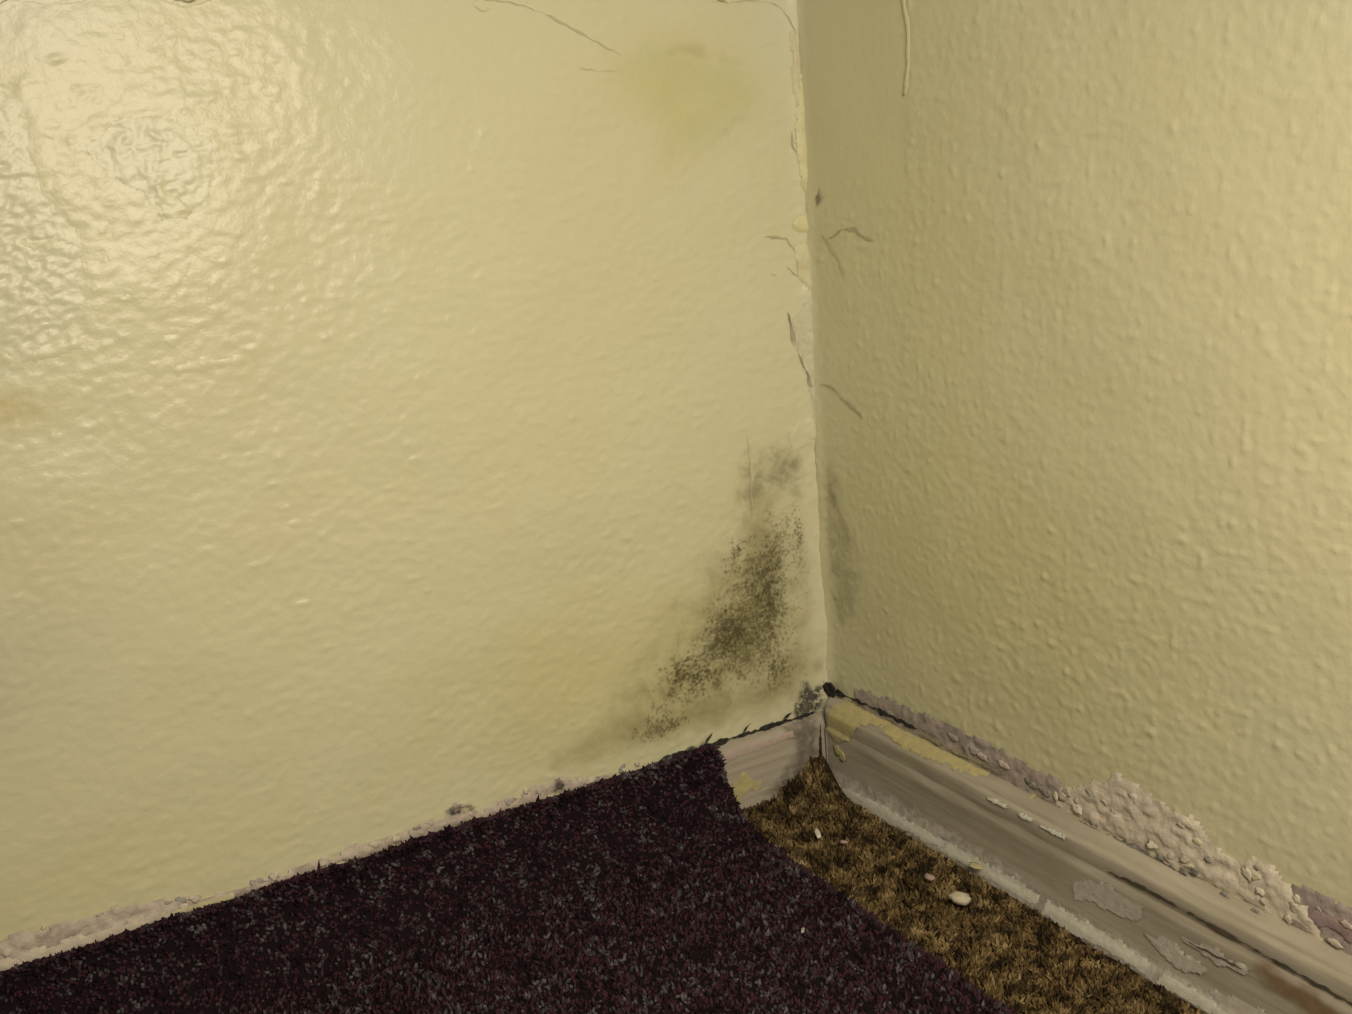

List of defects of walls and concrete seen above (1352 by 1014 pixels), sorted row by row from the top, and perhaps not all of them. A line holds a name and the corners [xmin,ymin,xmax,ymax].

crack [122,0,209,8]
crack [471,0,620,72]
crack [710,0,796,31]
crack [765,186,875,282]
crack [788,313,863,418]
damp [794,684,822,717]
spalling [826,689,1352,1014]